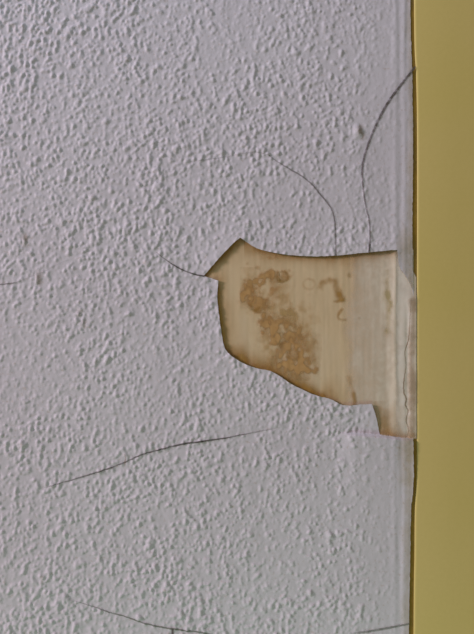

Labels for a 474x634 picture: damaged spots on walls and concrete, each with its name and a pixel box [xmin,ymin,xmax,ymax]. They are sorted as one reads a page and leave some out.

crack [361,66,416,252]
crack [283,165,337,255]
water stain [206,240,238,274]
water stain [217,270,327,398]
peeling [204,238,416,439]
crack [54,433,249,485]
crack [95,607,208,634]